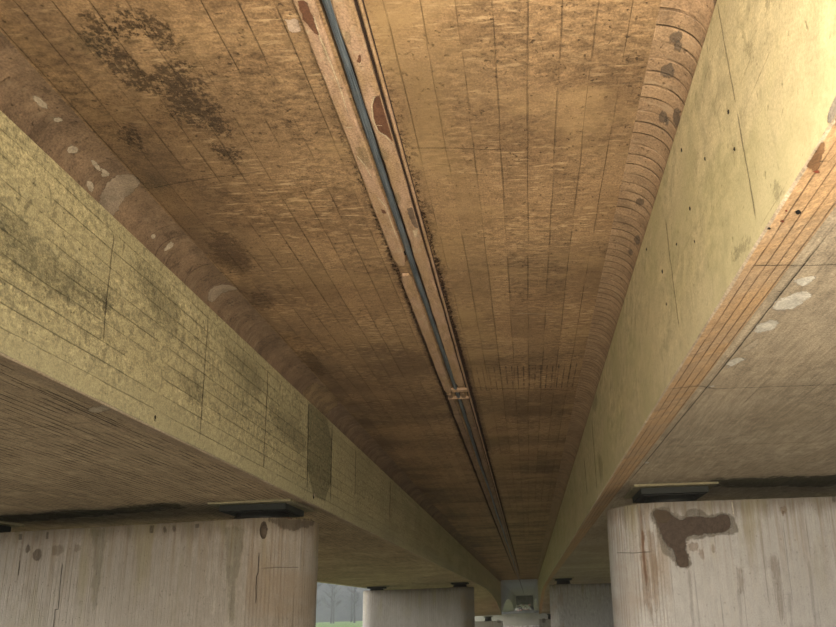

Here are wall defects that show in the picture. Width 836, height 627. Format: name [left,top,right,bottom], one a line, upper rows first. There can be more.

damp [79,6,242,164]
peeling [298,0,348,112]
damp [660,63,674,78]
damp [669,31,682,52]
peeling [371,95,393,145]
damp [659,108,680,127]